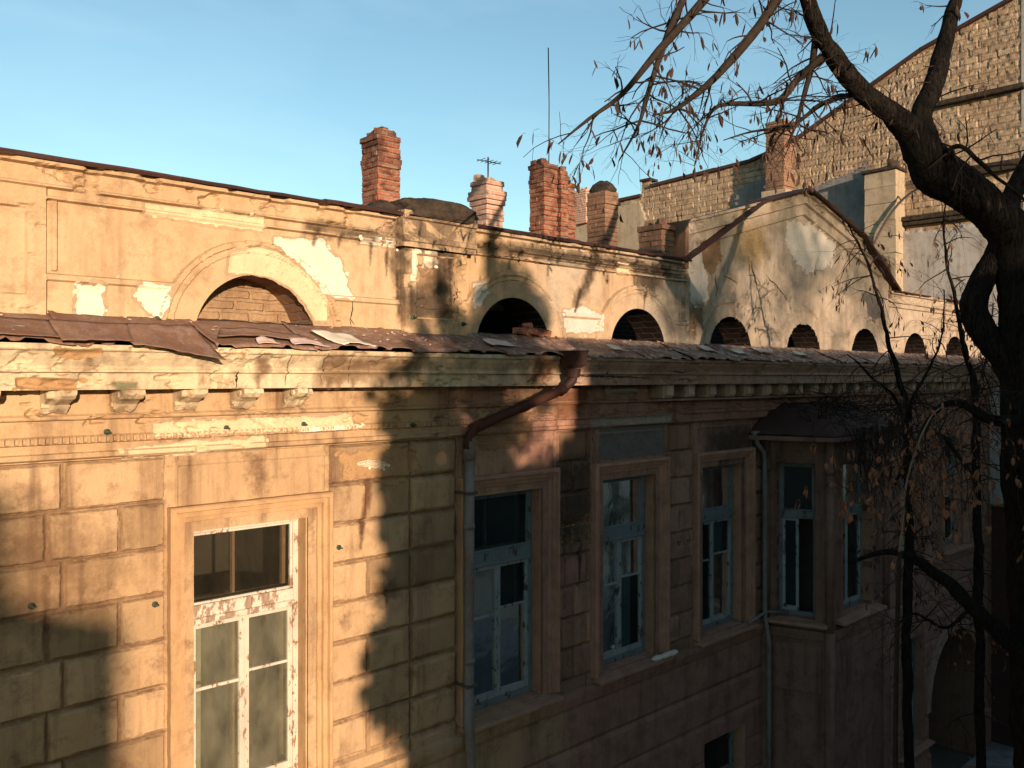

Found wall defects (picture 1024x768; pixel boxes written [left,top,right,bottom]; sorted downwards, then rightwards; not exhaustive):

peeling [140,199,356,325]
peeling [784,218,836,276]
peeling [68,279,109,316]
peeling [131,279,174,320]
peeling [562,304,605,338]
peeling [118,412,365,461]
spalling [334,442,422,487]